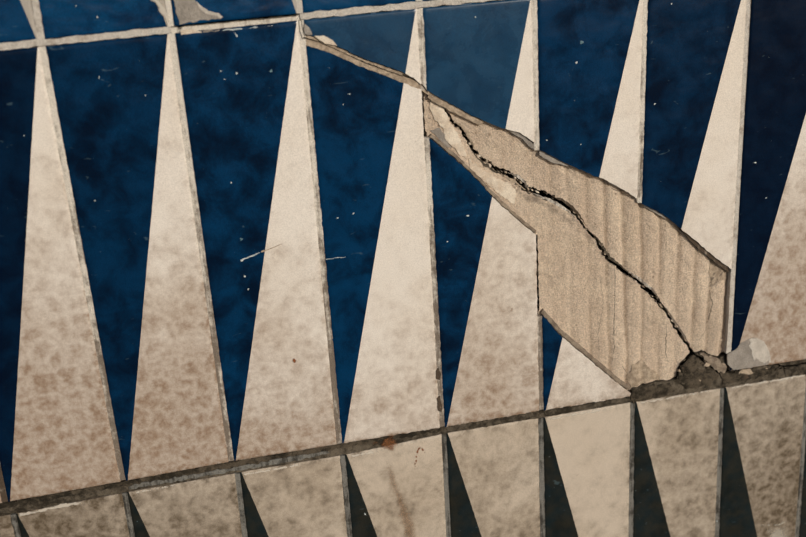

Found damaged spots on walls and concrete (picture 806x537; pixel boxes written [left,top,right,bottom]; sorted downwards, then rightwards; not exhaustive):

crack [299,23,734,381]
spalling [421,91,804,404]